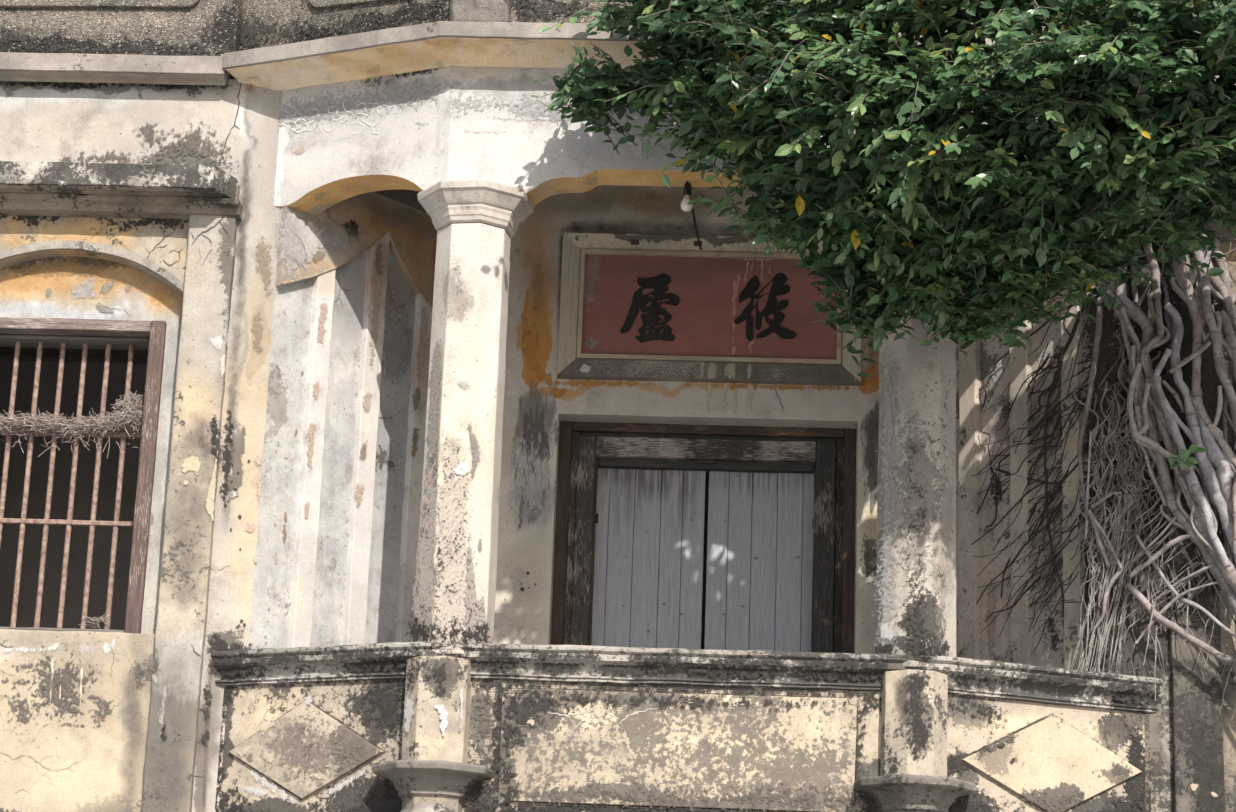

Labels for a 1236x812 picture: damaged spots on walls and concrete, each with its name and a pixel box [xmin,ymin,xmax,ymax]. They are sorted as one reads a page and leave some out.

damp [59,121,239,173]
crack [219,82,241,163]
peeling [252,313,263,354]
peeling [521,278,655,398]
flaking render [206,425,234,521]
peeling [507,399,559,529]
damp [2,639,116,731]
damp [130,654,172,762]
damp [198,595,952,812]
peeling [590,701,611,718]
damp [947,752,969,779]
damp [1183,695,1233,812]